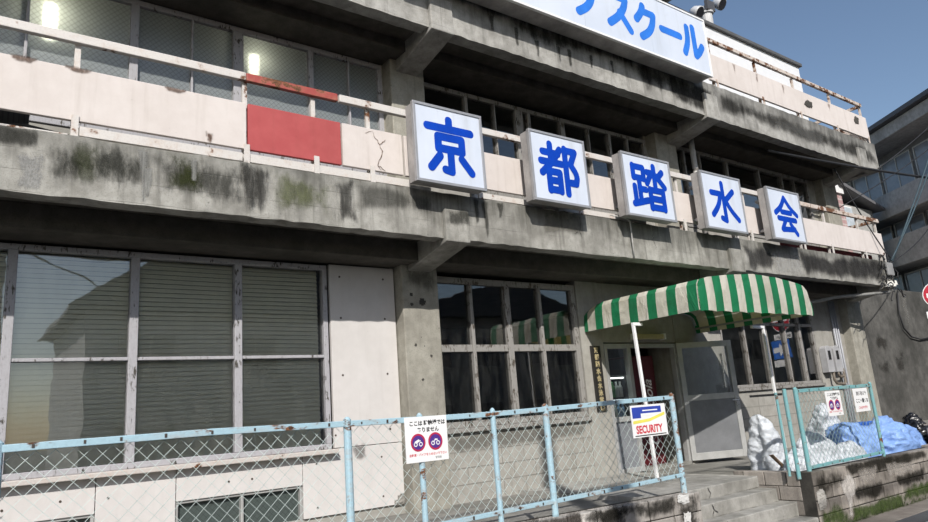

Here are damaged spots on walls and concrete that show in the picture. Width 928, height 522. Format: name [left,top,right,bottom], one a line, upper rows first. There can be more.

leakage [514,19,711,109]
leakage [0,125,36,145]
leakage [722,97,874,161]
leakage [54,155,81,174]
leakage [96,150,152,199]
leakage [167,160,231,197]
leakage [242,163,267,208]
leakage [340,182,355,219]
leakage [450,199,503,229]
leakage [745,247,886,279]
leakage [525,496,696,522]